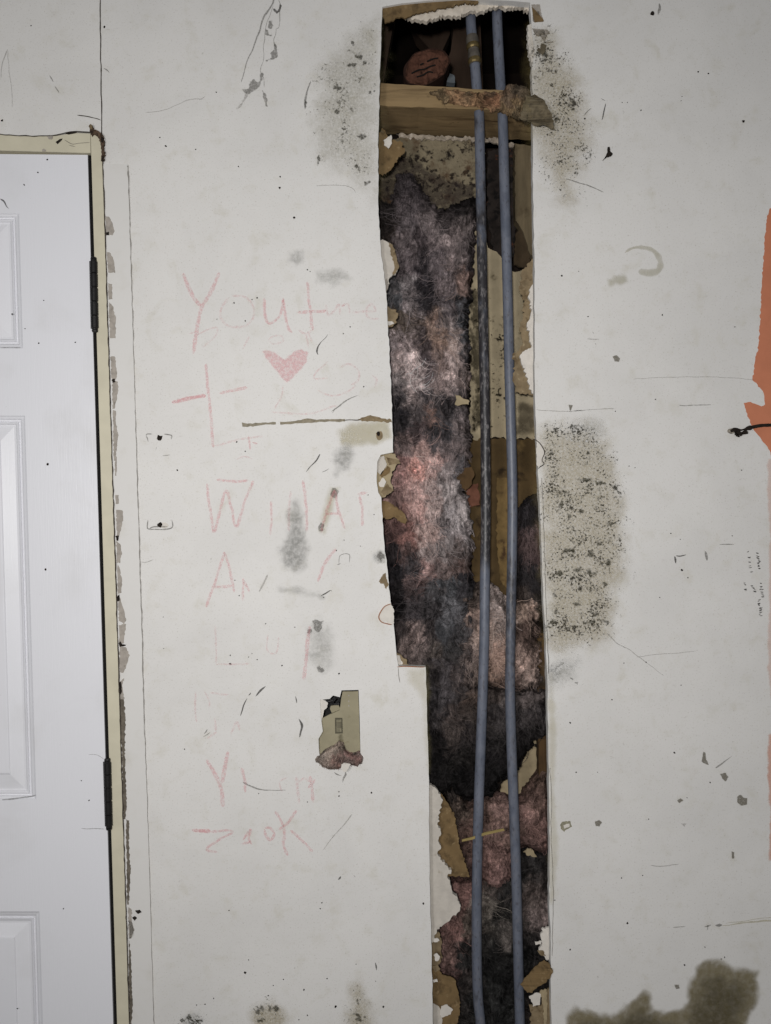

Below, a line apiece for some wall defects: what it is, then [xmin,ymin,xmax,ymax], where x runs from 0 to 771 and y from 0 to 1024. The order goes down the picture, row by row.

spalling [385,4,546,90]
damp [527,30,591,191]
damp [399,142,476,198]
spalling [475,138,531,250]
spalling [519,285,533,394]
peeling [518,437,545,467]
damp [534,423,626,643]
peeling [378,603,394,625]
spalling [429,783,461,982]
peeling [433,1003,453,1024]
peeling [529,989,548,1024]
damp [569,962,756,1024]